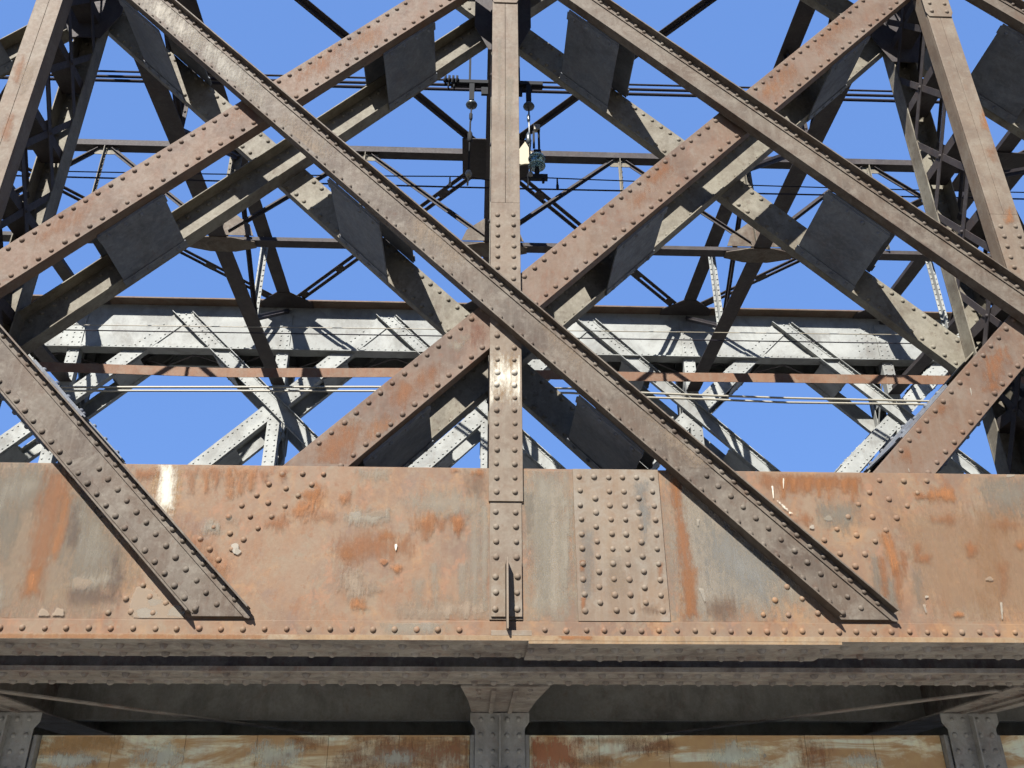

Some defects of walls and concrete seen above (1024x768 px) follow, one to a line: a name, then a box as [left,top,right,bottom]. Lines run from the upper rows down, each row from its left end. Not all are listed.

rust [671,480,696,616]
rust [336,737,468,768]
rust [532,737,581,768]